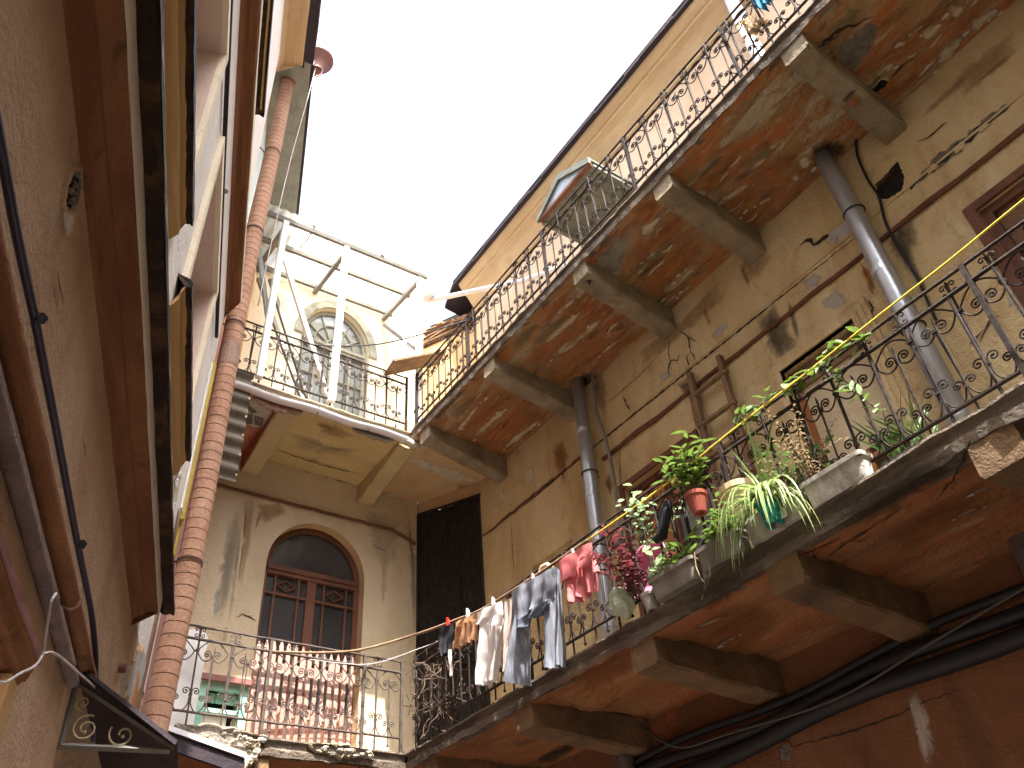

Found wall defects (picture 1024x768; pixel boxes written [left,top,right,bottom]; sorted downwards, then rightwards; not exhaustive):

peeling [637,205,710,305]
peeling [516,296,631,382]
water stain [762,307,797,353]
peeling [453,393,548,454]
crack [500,234,854,573]
spalling [174,723,269,768]
spalling [308,742,374,761]
crack [794,689,960,747]